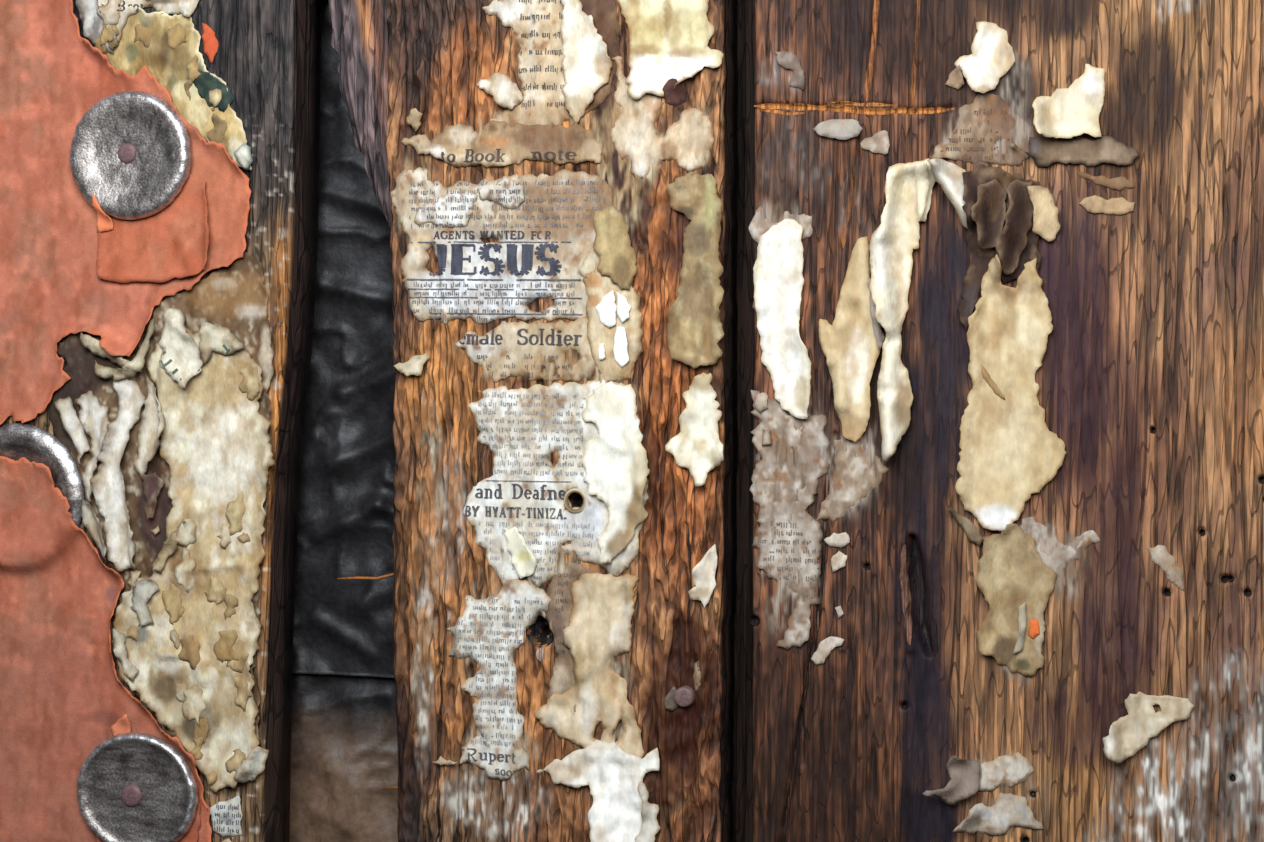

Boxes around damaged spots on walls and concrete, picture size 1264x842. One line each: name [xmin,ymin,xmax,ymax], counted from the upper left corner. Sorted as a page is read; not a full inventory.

peeling [477,72,524,110]
peeling [617,0,724,100]
peeling [945,21,1015,94]
peeling [1032,64,1105,139]
peeling [414,176,525,228]
peeling [753,158,968,462]
water stain [1039,206,1102,449]
peeling [665,372,724,487]
peeling [55,308,252,760]
peeling [534,383,661,842]
water stain [1106,560,1138,681]
peeling [1102,691,1195,842]